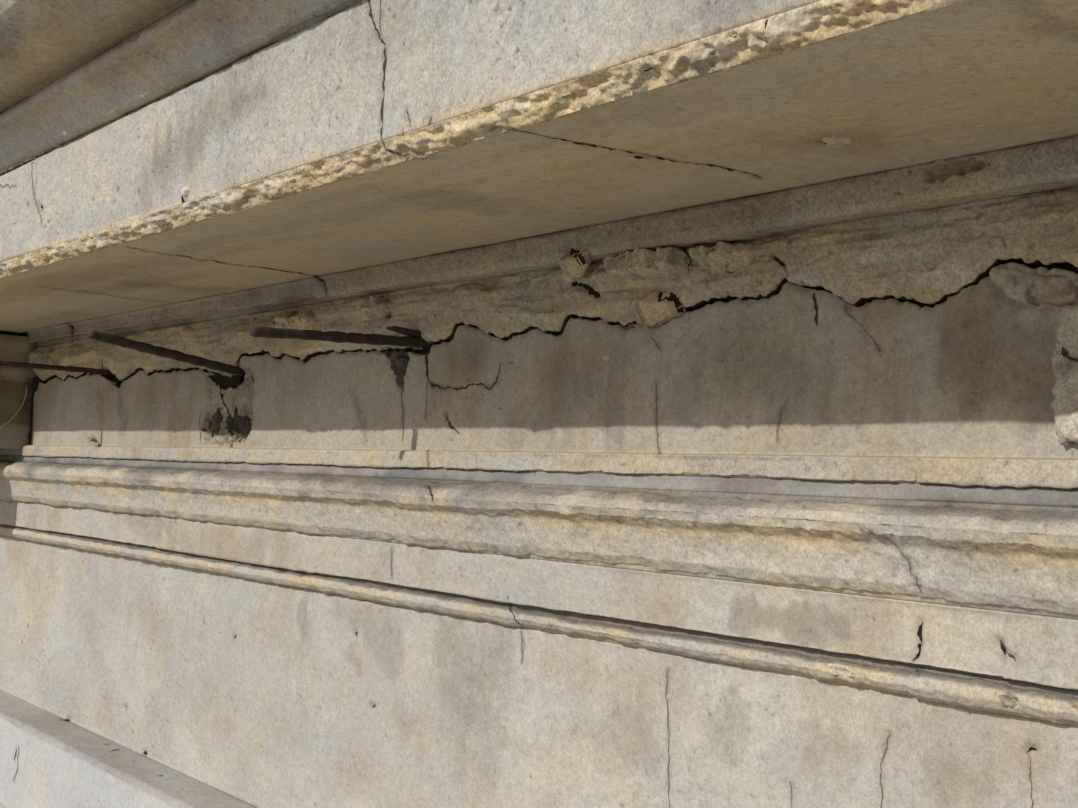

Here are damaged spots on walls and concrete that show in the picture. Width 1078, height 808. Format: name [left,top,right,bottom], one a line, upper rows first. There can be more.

crack [368,0,436,160]
spalling [557,248,592,283]
crack [1006,261,1078,273]
spalling [266,310,325,342]
rust [386,326,422,338]
peeling [621,292,686,329]
spalling [199,367,254,445]
crack [105,351,355,390]
spalling [385,350,410,440]
crack [396,316,622,434]
crack [912,623,922,676]
crack [1026,747,1037,808]